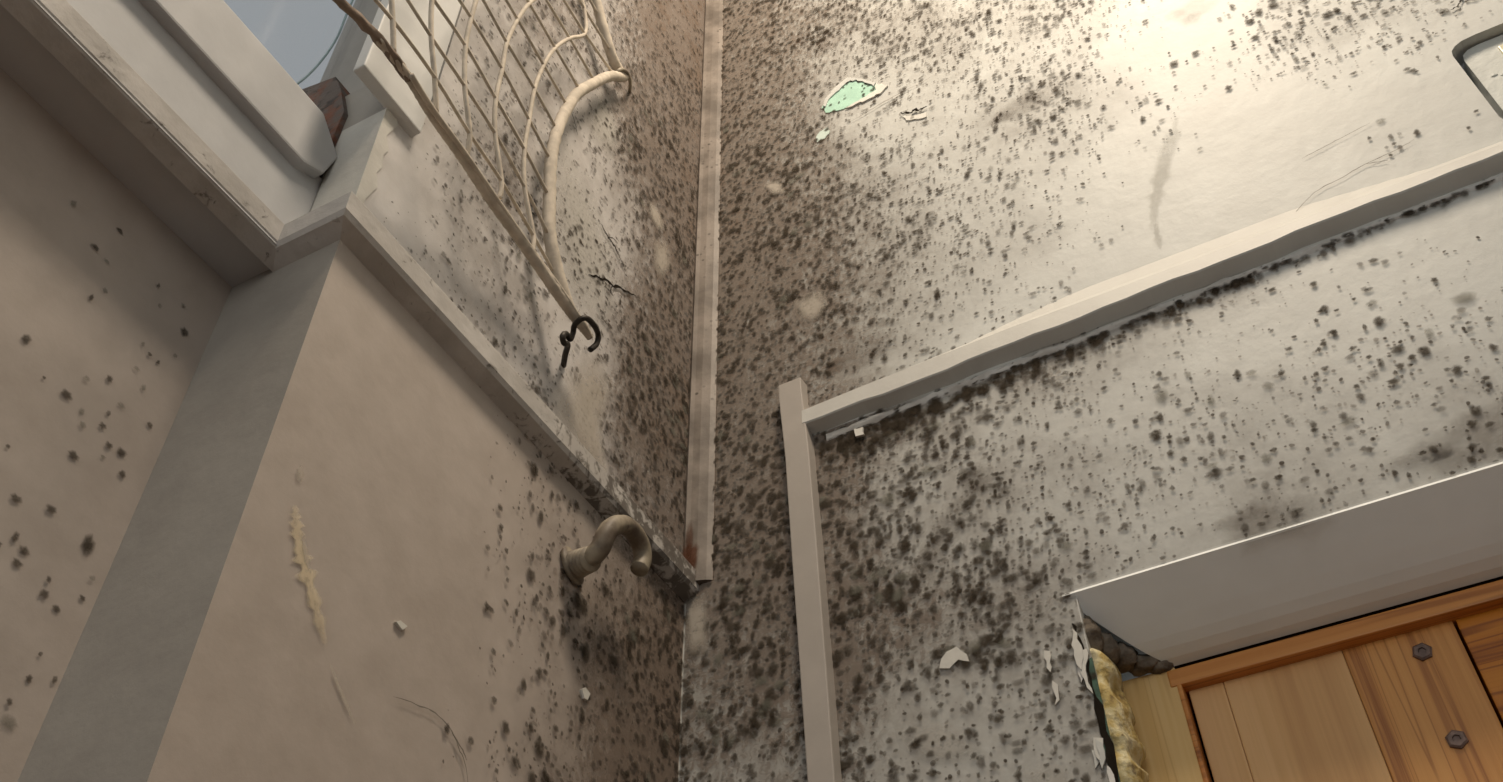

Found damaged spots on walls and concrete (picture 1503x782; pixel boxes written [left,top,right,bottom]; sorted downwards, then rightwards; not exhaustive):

damp [62,390,125,477]
damp [408,0,1503,782]
damp [0,533,28,566]
damp [83,537,94,552]